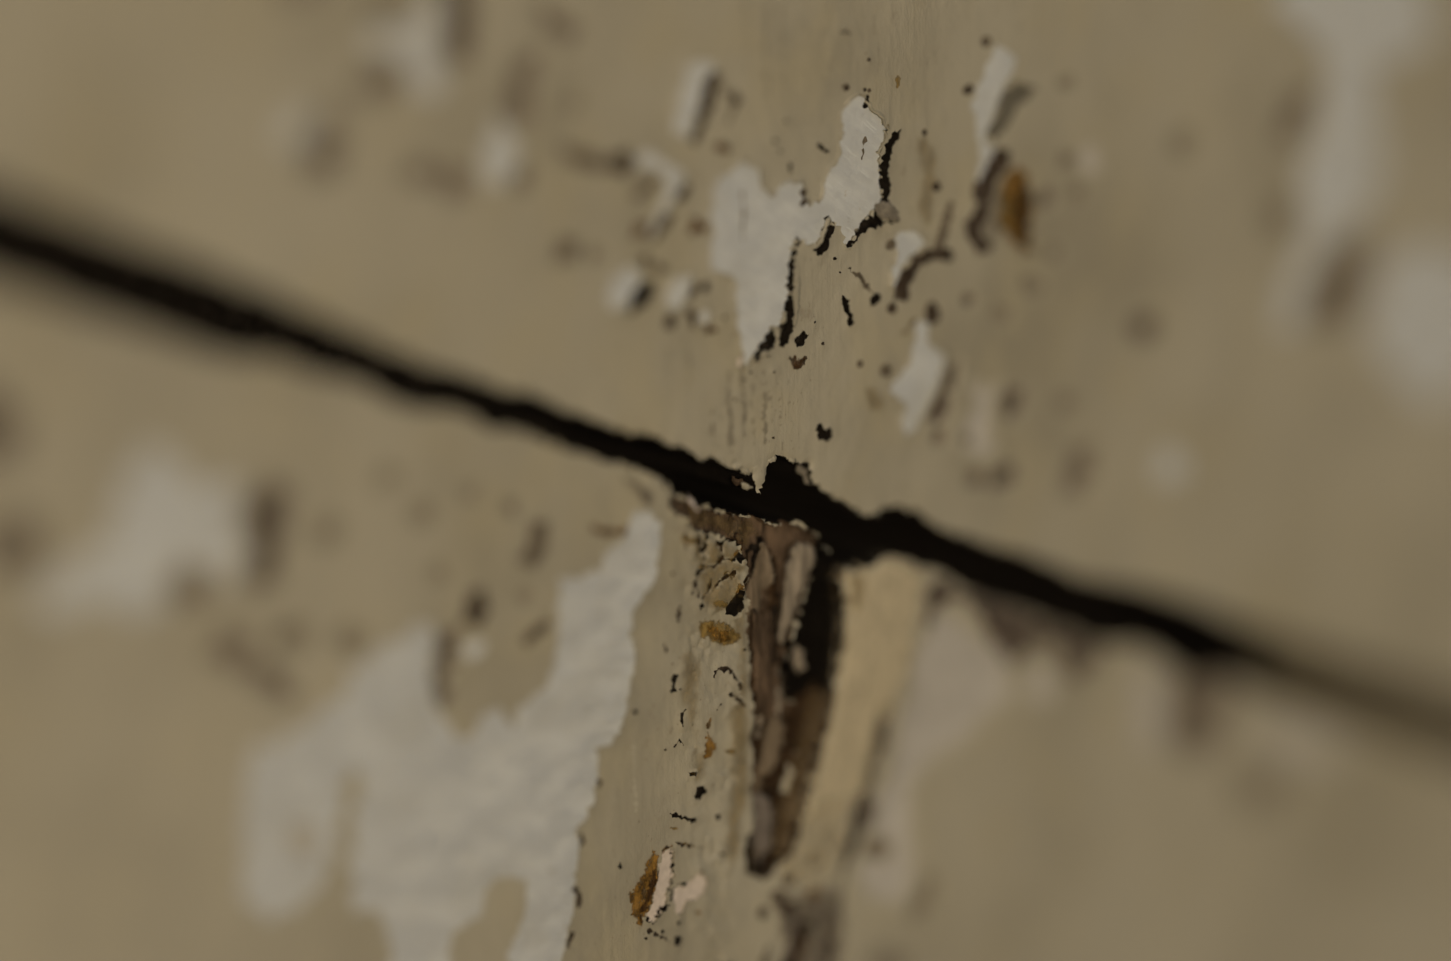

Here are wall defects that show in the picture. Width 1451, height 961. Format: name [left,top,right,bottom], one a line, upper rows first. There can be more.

crack [842,83,871,93]
crack [788,143,829,174]
peeling [589,36,1036,381]
peeling [857,301,1032,498]
peeling [815,423,833,442]
crack [0,188,1451,758]
hole [725,590,745,617]
peeling [239,509,662,961]
peeling [689,772,707,800]
crack [670,812,702,848]
peeling [644,848,708,946]
spalling [757,869,798,920]